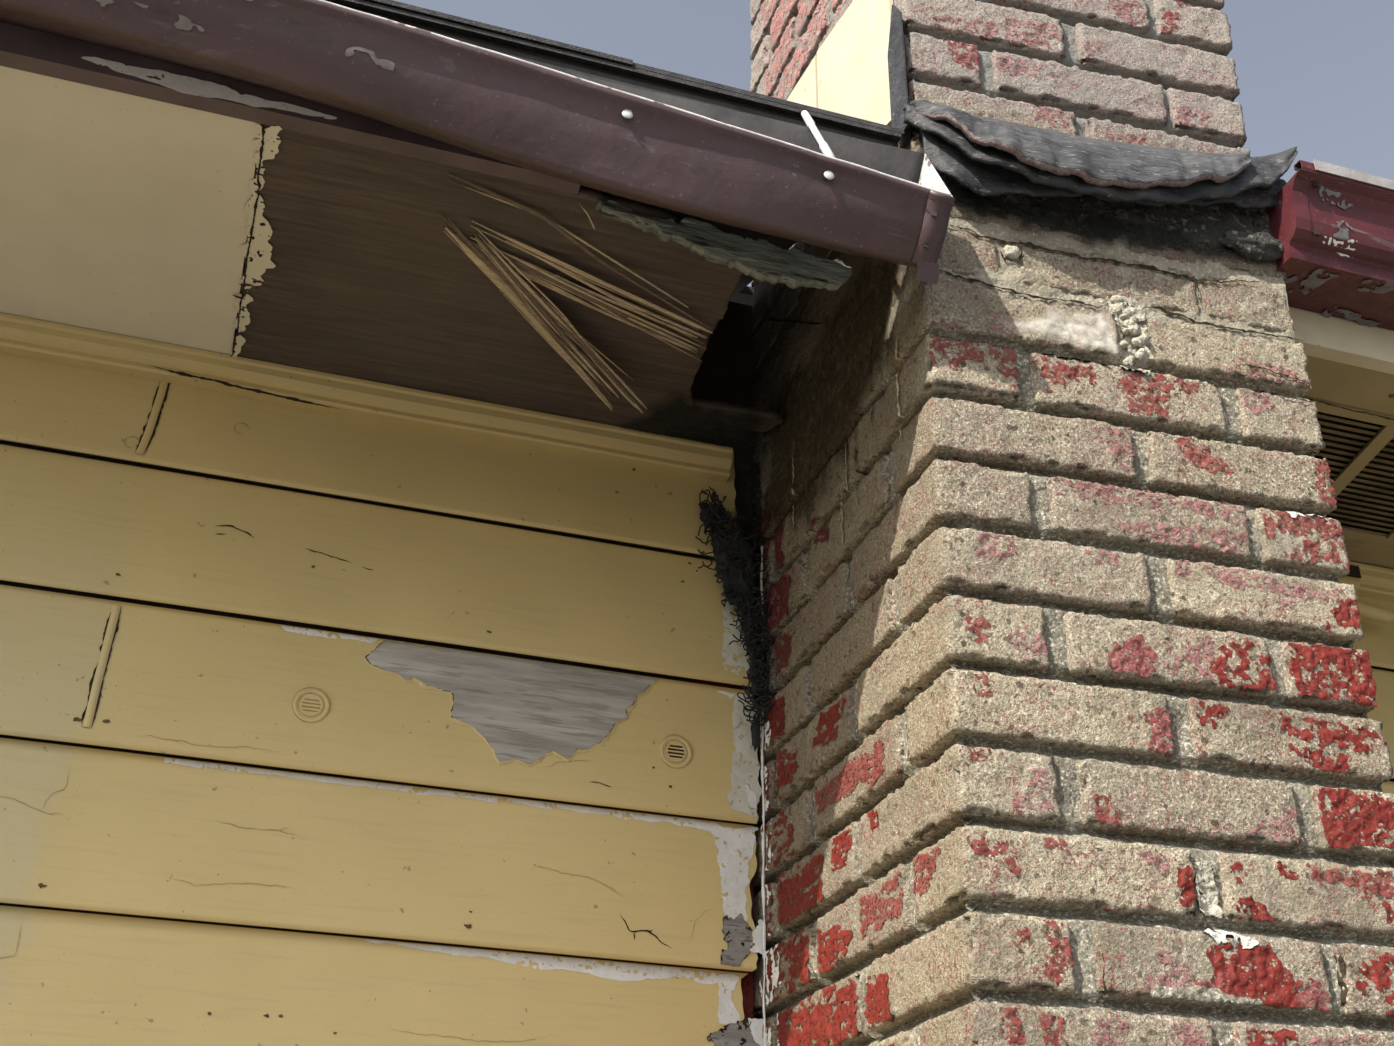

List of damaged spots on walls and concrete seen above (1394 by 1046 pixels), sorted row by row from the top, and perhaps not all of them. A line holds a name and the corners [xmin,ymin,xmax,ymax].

peeling [81,56,337,357]
peeling [1319,186,1355,258]
peeling [1286,269,1339,295]
water stain [1023,315,1117,350]
peeling [1053,295,1380,728]
peeling [164,522,941,1046]
peeling [1278,712,1394,848]
crack [531,866,712,948]
peeling [1306,863,1394,900]